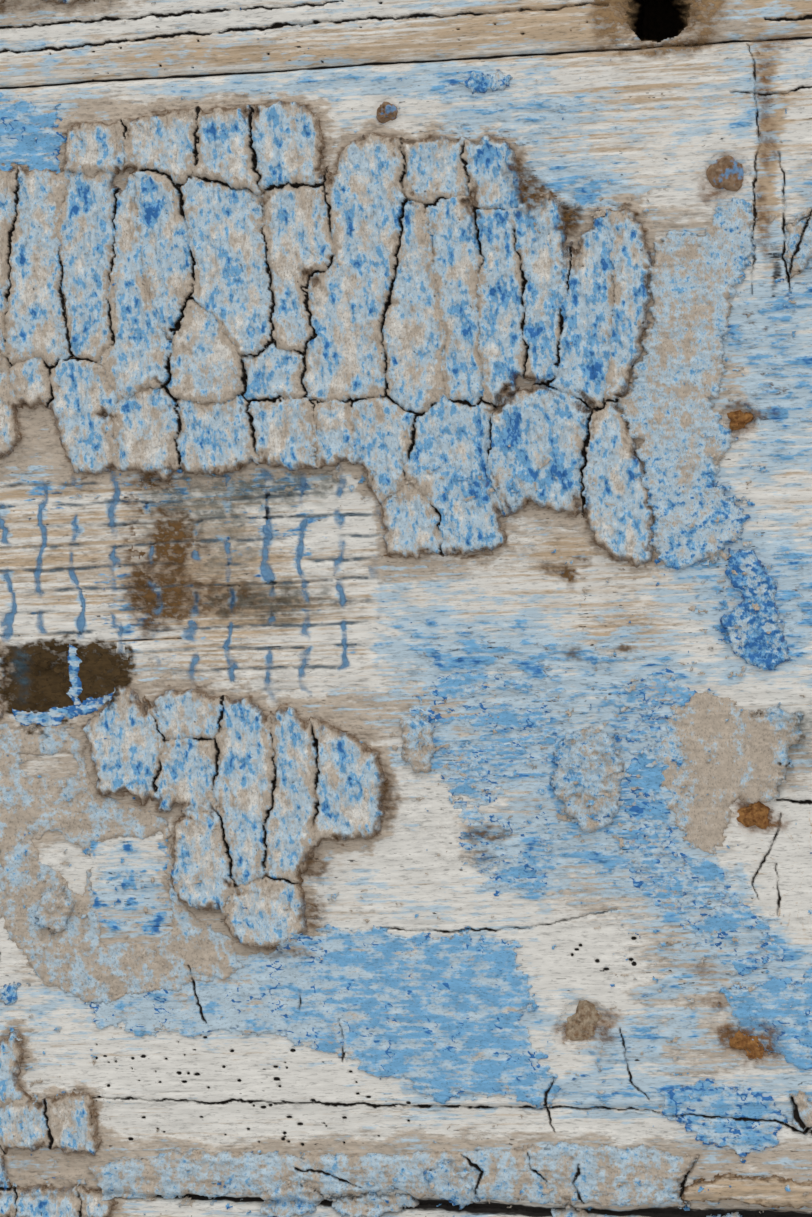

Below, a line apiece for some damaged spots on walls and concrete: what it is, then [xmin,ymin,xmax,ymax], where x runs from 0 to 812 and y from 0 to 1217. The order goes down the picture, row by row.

leakage [592,0,632,49]
leakage [640,0,724,56]
crack [765,14,812,22]
crack [741,65,812,288]
peeling [0,93,791,671]
leakage [125,471,304,629]
crack [0,106,619,887]
peeling [0,644,561,1108]
corrosion [719,1025,775,1056]
crack [43,1099,54,1149]
peeling [0,1029,119,1217]
peeling [423,1160,481,1210]